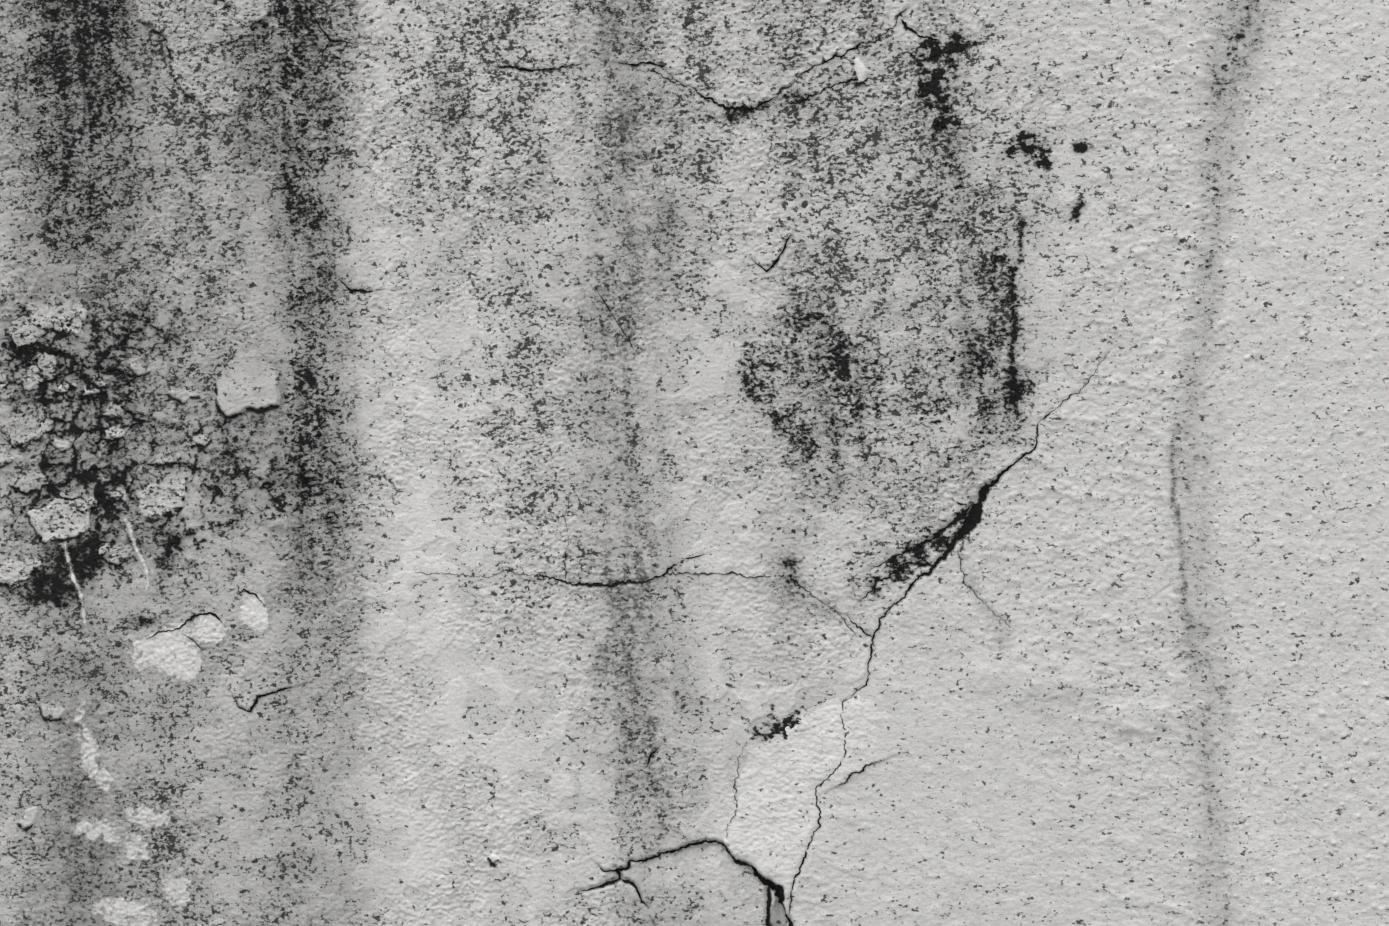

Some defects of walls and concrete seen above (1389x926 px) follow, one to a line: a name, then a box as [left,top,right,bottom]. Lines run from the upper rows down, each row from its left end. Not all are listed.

spalling [0,293,211,594]
leakage [0,0,369,648]
crack [496,63,583,72]
leakage [571,0,703,926]
leakage [705,88,821,125]
crack [417,351,1110,926]
crack [618,9,938,111]
leakage [726,33,1085,625]